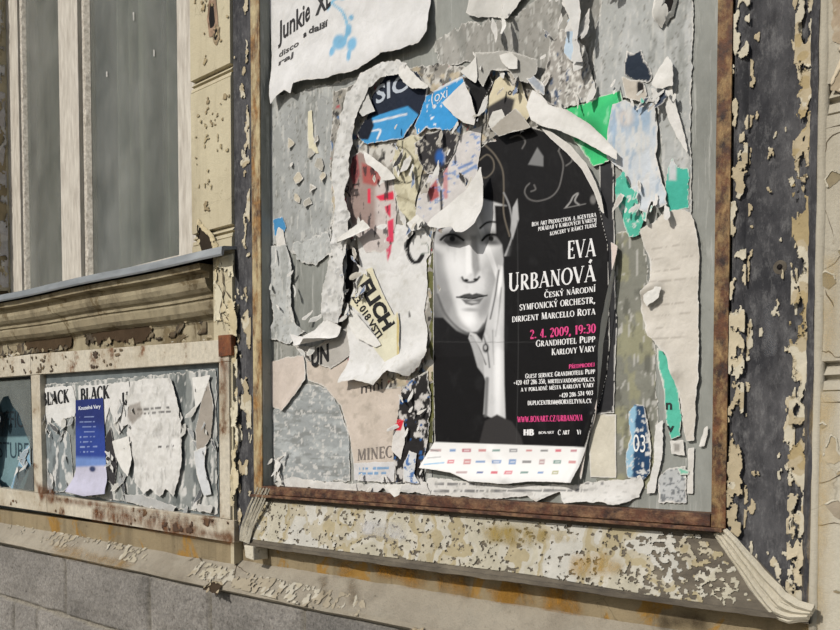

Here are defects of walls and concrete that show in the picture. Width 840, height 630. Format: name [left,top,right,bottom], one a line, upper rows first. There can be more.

peeling [732,0,760,88]
peeling [239,40,250,177]
peeling [730,98,759,237]
peeling [242,189,250,257]
peeling [730,249,753,301]
peeling [749,0,813,601]
peeling [196,201,252,525]
peeling [728,305,763,423]
corrosion [37,485,212,535]
peeling [187,561,366,616]
peeling [252,501,751,606]
peeling [726,433,760,537]